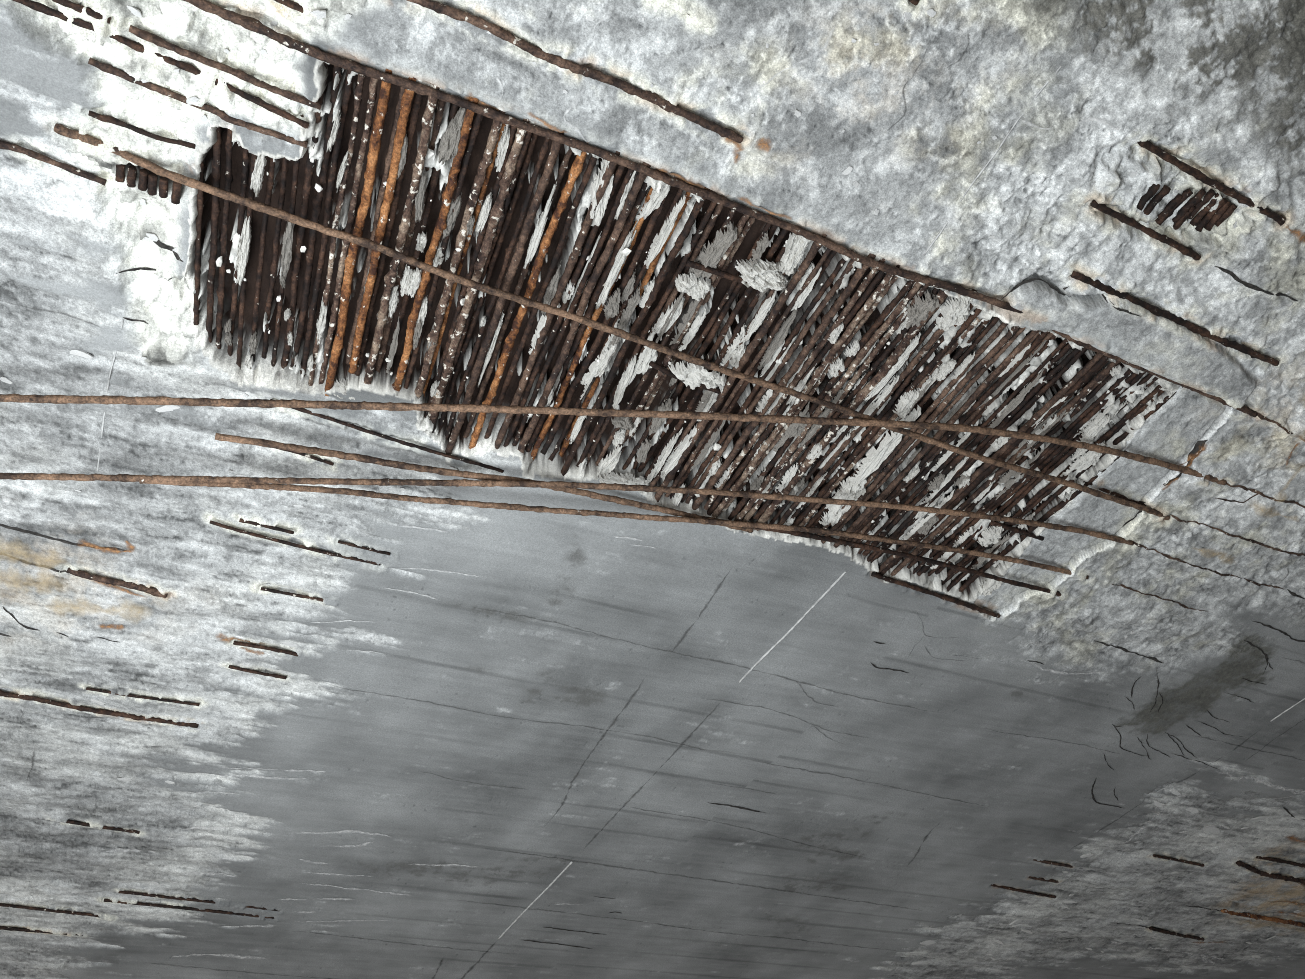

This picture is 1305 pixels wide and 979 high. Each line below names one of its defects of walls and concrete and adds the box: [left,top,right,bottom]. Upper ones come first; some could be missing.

rust [0,0,1279,618]
crack [1001,278,1141,317]
crack [1215,266,1297,301]
peeling [207,0,1305,687]
peeling [0,0,778,979]
rust [0,687,200,728]
leakage [1114,631,1281,743]
crack [1091,621,1305,808]
rust [1153,854,1204,867]
rust [1236,856,1305,886]
rust [1221,901,1305,928]